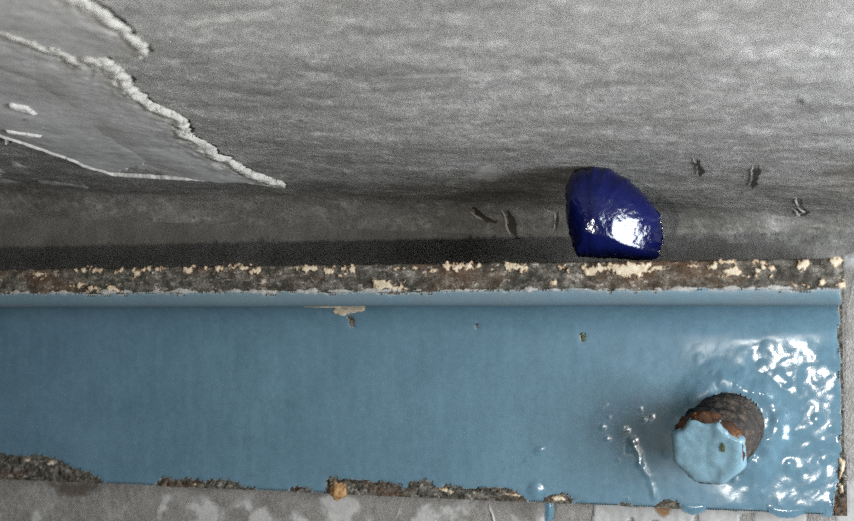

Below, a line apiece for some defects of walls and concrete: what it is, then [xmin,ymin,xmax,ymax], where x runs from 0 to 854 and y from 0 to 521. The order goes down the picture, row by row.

flaking render [0,0,288,189]
corrosion [675,411,747,461]
corrosion [0,453,101,495]
corrosion [160,478,250,490]
corrosion [326,476,525,502]
corrosion [543,493,570,504]